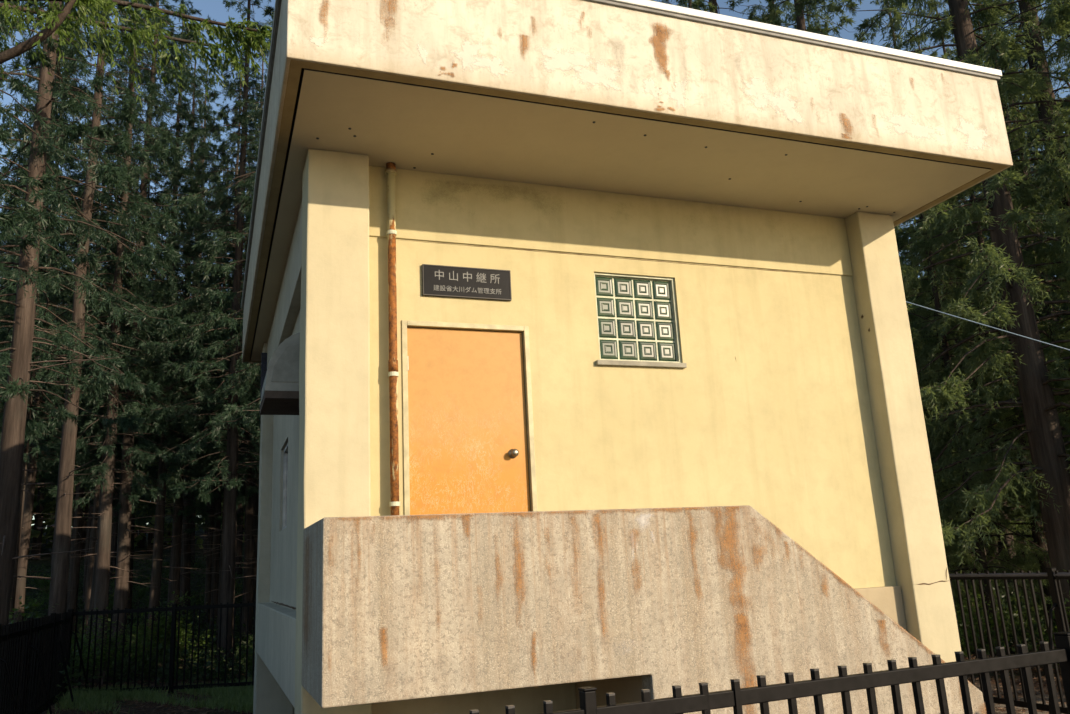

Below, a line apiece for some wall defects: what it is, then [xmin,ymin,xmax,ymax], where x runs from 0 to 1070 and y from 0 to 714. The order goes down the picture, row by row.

corrosion [651,24,670,77]
corrosion [388,514,473,535]
corrosion [551,510,604,551]
corrosion [515,531,524,595]
corrosion [653,506,762,688]